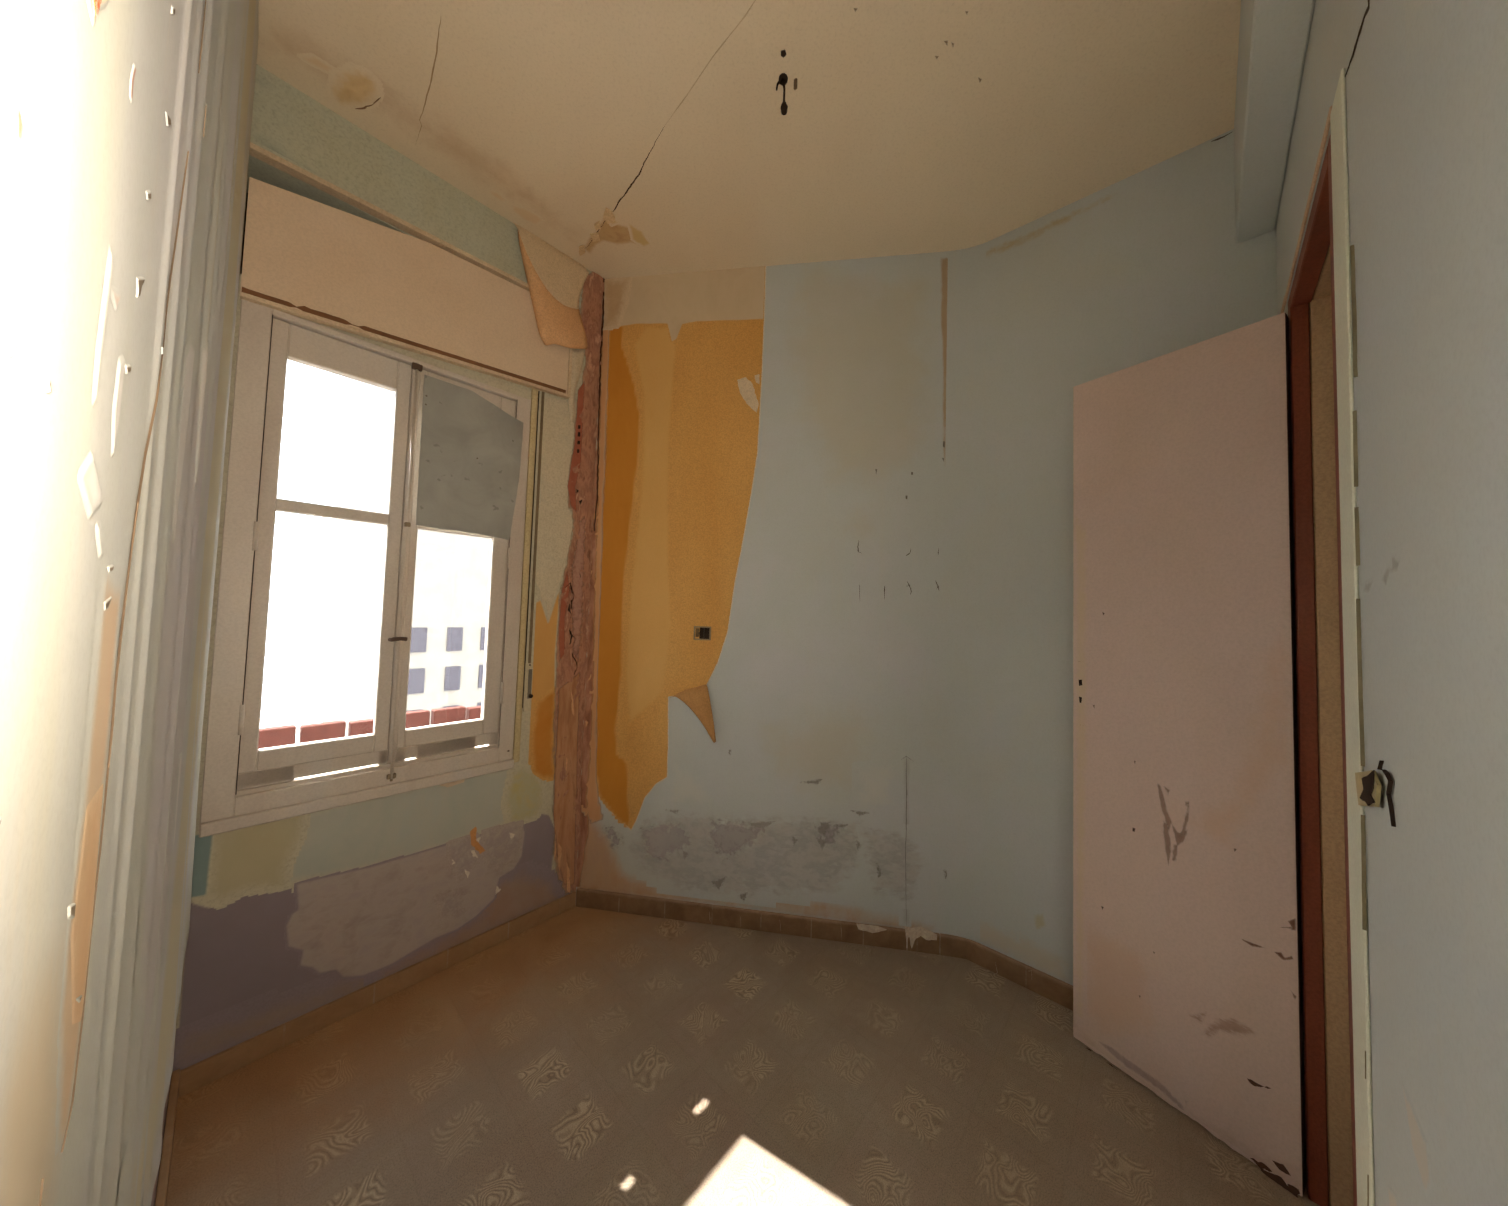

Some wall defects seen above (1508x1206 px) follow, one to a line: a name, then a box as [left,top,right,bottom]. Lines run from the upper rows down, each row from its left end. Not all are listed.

peeling [535,206,766,894]